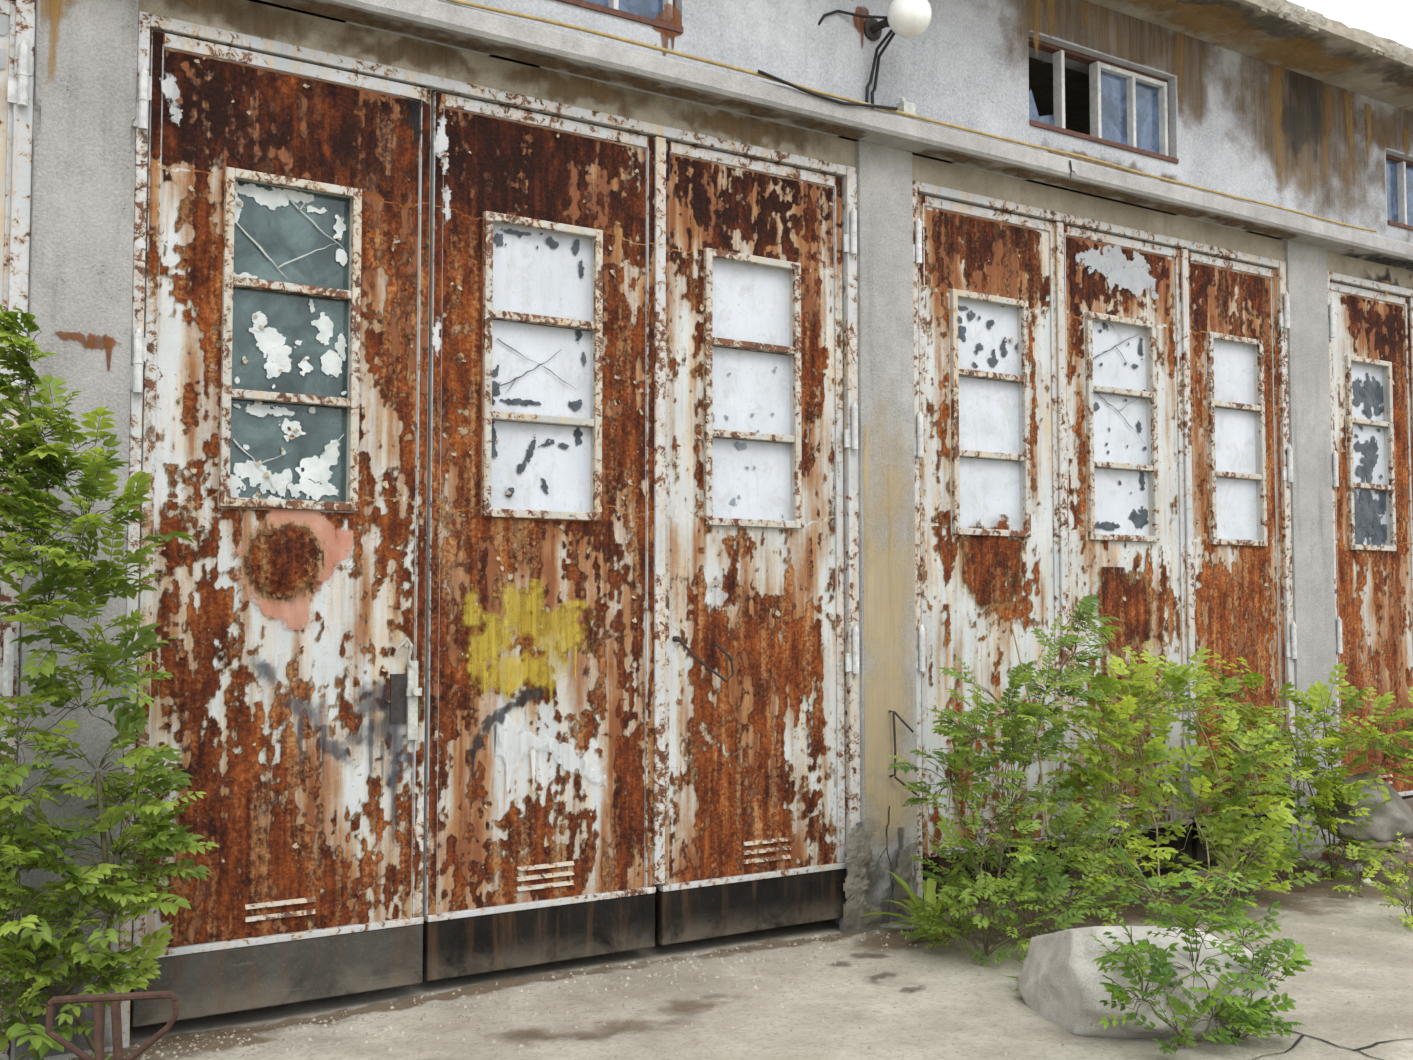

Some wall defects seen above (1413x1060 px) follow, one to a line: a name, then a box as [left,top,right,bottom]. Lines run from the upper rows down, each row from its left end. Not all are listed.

peeling [161,76,183,123]
damp [1010,0,1413,206]
peeling [234,181,348,266]
peeling [230,299,353,630]
corrosion [135,31,845,948]
peeling [705,580,728,609]
corrosion [919,194,1288,852]
corrosion [1334,294,1413,792]
crack [1252,1019,1411,1060]